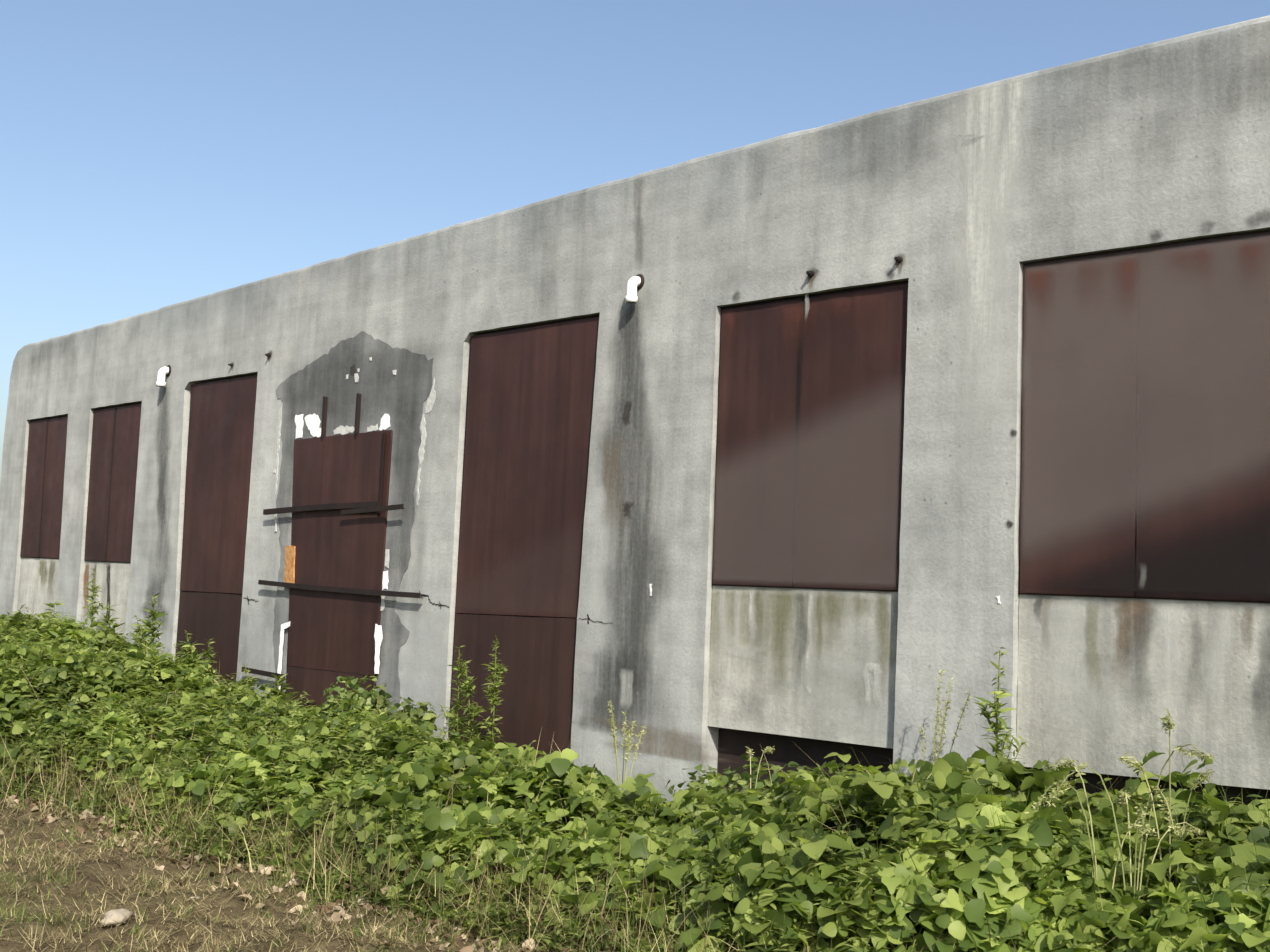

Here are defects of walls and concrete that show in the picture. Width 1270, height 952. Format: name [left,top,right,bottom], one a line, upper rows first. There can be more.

spalling [346,357,372,382]
peeling [273,407,390,493]
spalling [416,378,435,505]
water stain [594,306,705,759]
peeling [277,622,290,689]
peeling [374,549,389,674]
water stain [801,594,830,664]